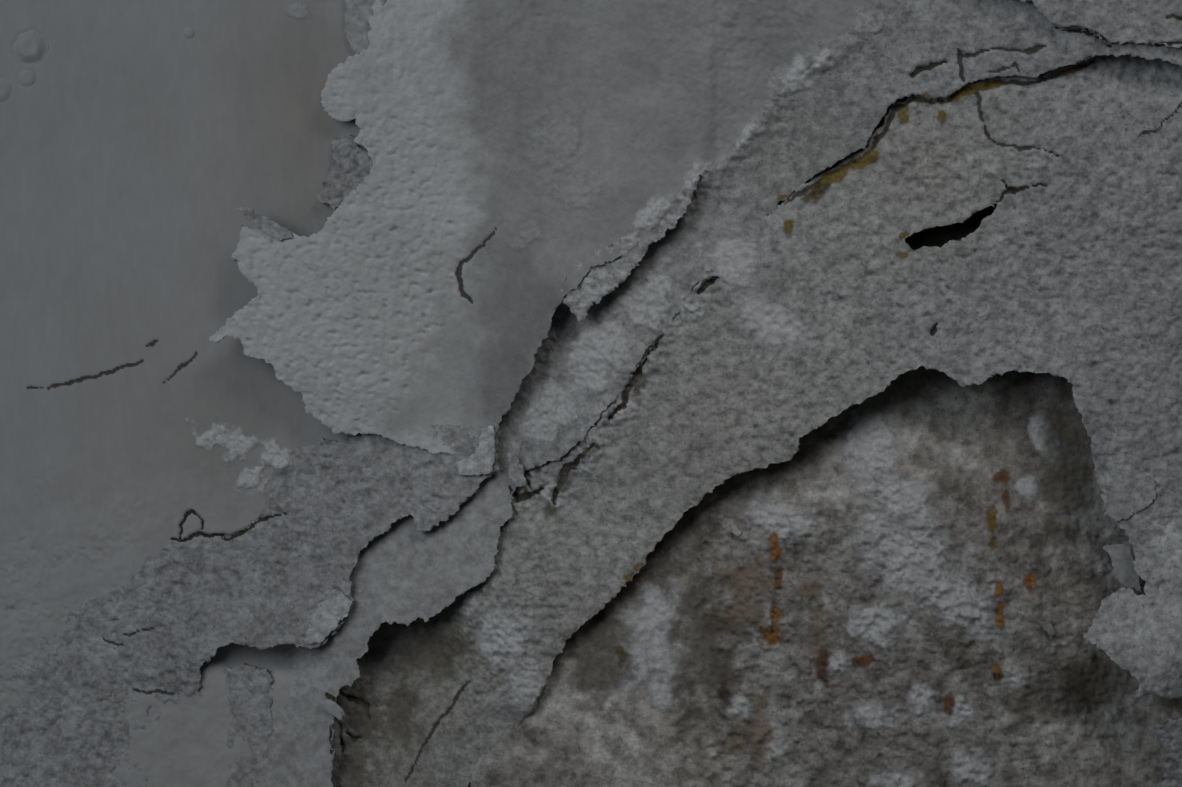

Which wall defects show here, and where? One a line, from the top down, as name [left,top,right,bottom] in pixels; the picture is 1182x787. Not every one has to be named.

crack [784,26,1112,205]
corrosion [937,80,1005,123]
corrosion [803,150,878,202]
crack [455,228,497,304]
crack [27,340,158,390]
crack [508,334,664,505]
peeling [225,54,1182,787]
crack [171,509,287,542]
corrosion [987,470,1009,547]
peeling [0,423,501,787]
corrosion [759,603,780,645]
corrosion [943,694,954,715]